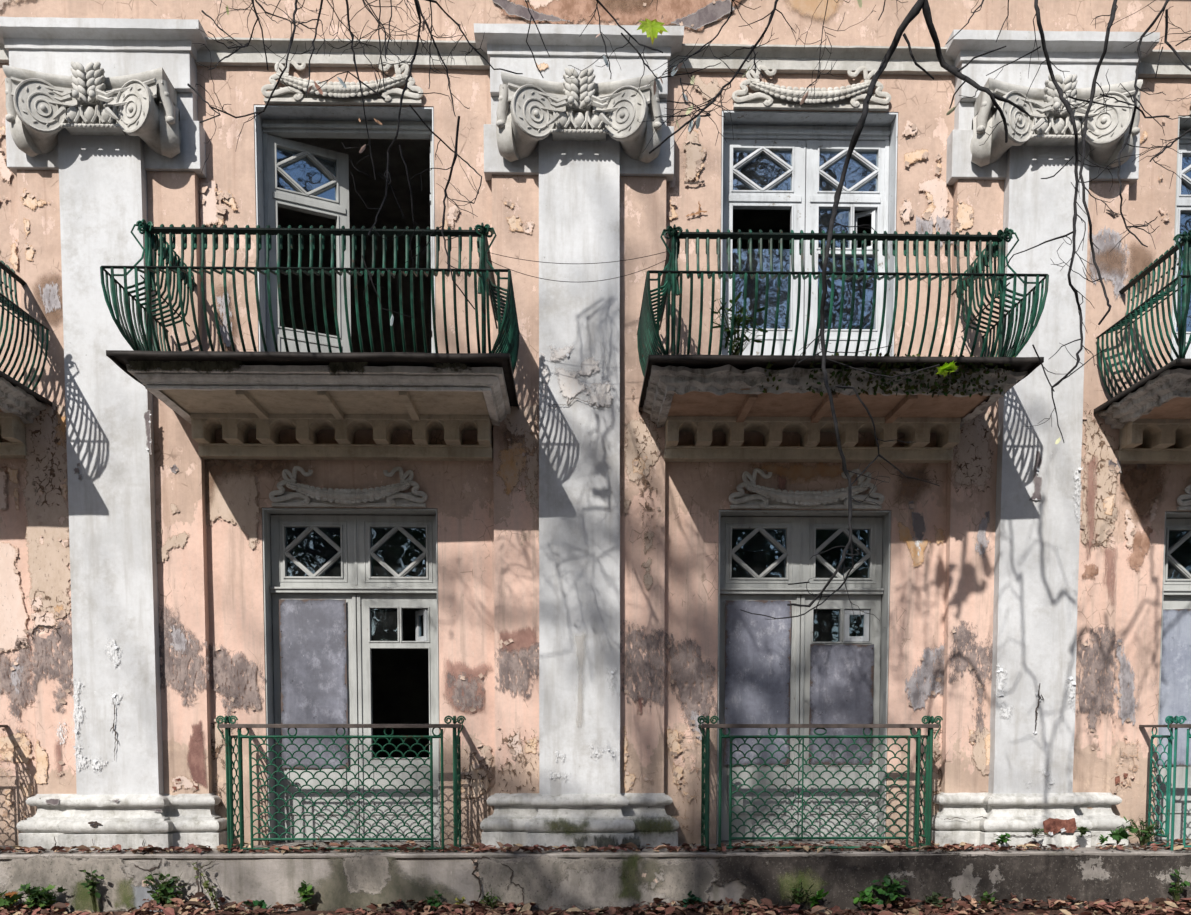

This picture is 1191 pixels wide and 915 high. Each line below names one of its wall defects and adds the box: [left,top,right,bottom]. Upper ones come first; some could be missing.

peeling [0,126,50,270]
peeling [540,345,613,407]
spalling [1029,451,1042,501]
peeling [0,402,107,832]
spalling [159,604,265,807]
spalling [445,627,539,713]
crack [471,856,524,902]
spalling [620,620,719,833]
peeling [924,725,943,816]
spalling [905,621,1013,776]
spalling [1043,818,1077,835]
spalling [1066,627,1139,793]